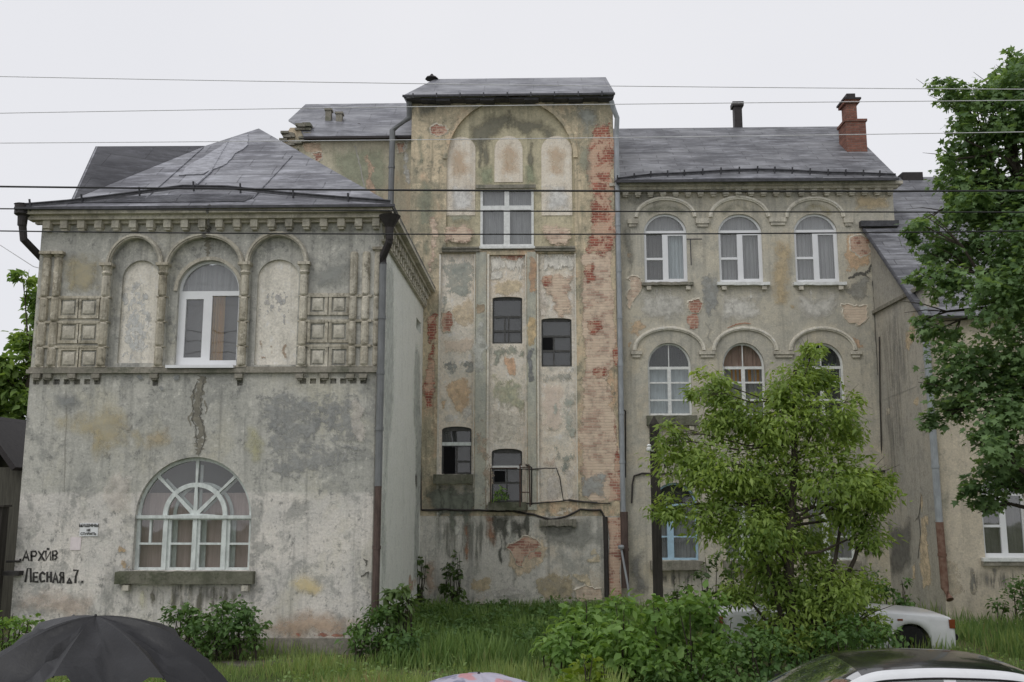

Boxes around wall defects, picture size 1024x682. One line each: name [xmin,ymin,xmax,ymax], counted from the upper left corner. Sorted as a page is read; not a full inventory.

flaking render [422,216,475,412]
flaking render [490,123,704,517]
spalling [799,291,869,348]
spalling [844,233,871,272]
crack [848,264,916,401]
crack [187,375,208,455]
leakage [414,350,591,589]
flaking render [536,517,621,602]